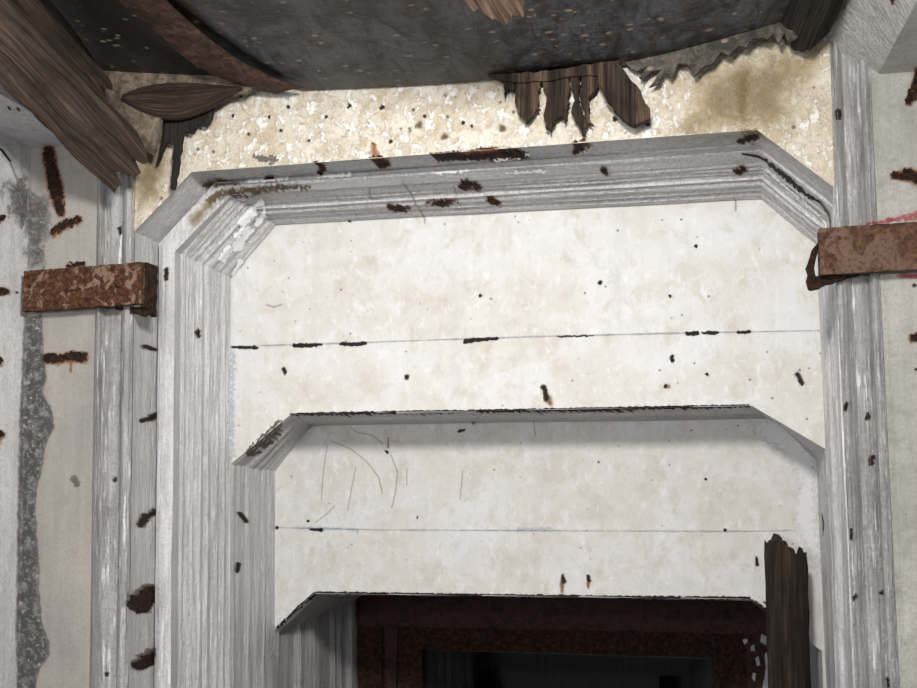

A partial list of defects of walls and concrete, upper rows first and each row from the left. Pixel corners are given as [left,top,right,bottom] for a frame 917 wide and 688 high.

leakage [686,57,808,131]
rust [905,68,917,106]
spalling [253,154,279,165]
rust [42,146,82,238]
peeling [742,634,768,688]